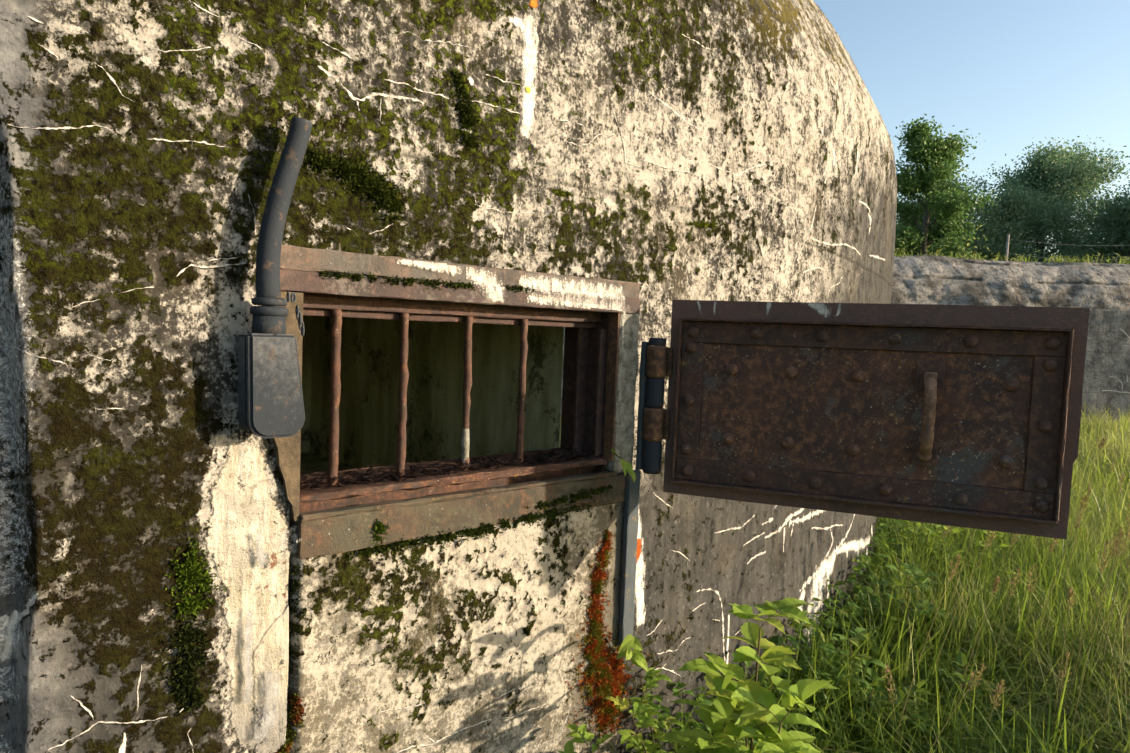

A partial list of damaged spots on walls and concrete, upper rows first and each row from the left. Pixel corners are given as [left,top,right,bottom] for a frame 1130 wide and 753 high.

crack [318,42,521,121]
damp [500,14,539,138]
crack [9,123,111,131]
crack [149,138,230,148]
damp [397,259,505,303]
damp [519,274,626,372]
corrosion [300,443,602,490]
crack [716,508,855,591]
damp [409,572,448,651]
crack [647,588,741,677]
crack [49,665,193,750]
damp [243,613,280,741]